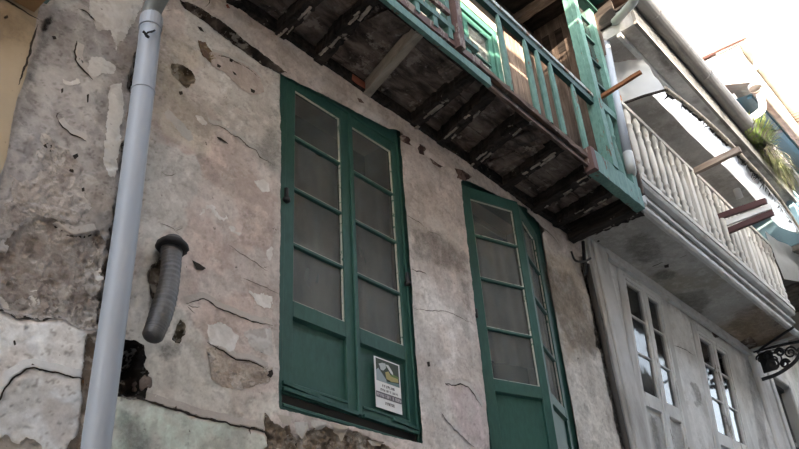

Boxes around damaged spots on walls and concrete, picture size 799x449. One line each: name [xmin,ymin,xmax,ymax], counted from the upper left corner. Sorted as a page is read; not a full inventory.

peeling [87,57,116,77]
peeling [89,0,144,50]
flaking render [171,63,196,88]
flaking render [180,0,287,96]
peeling [103,83,124,178]
flaking render [0,133,107,449]
crack [183,292,273,326]
crack [0,358,82,400]
flaking render [206,322,273,390]
flaking render [264,413,399,449]